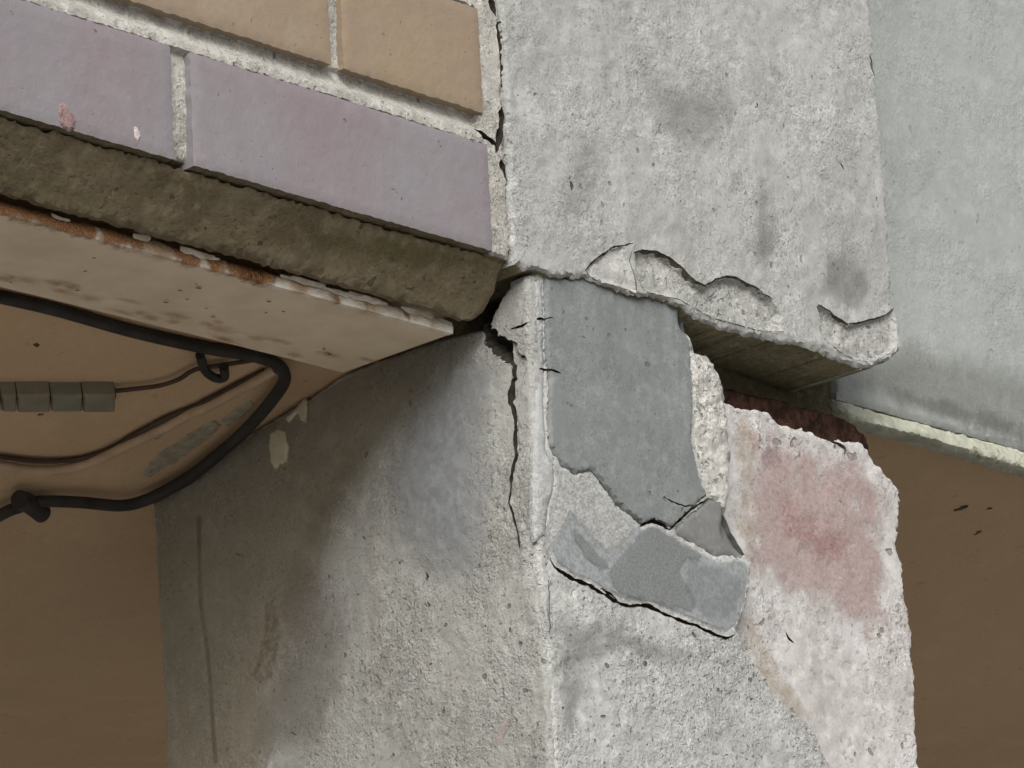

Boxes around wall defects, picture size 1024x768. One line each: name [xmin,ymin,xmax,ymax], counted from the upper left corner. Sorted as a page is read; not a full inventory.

crack [475,0,507,181]
corrosion [0,201,143,249]
corrosion [170,246,276,285]
spalling [586,246,784,332]
spalling [817,307,897,362]
crack [483,317,561,548]
peeling [544,473,633,551]
crack [548,559,734,640]